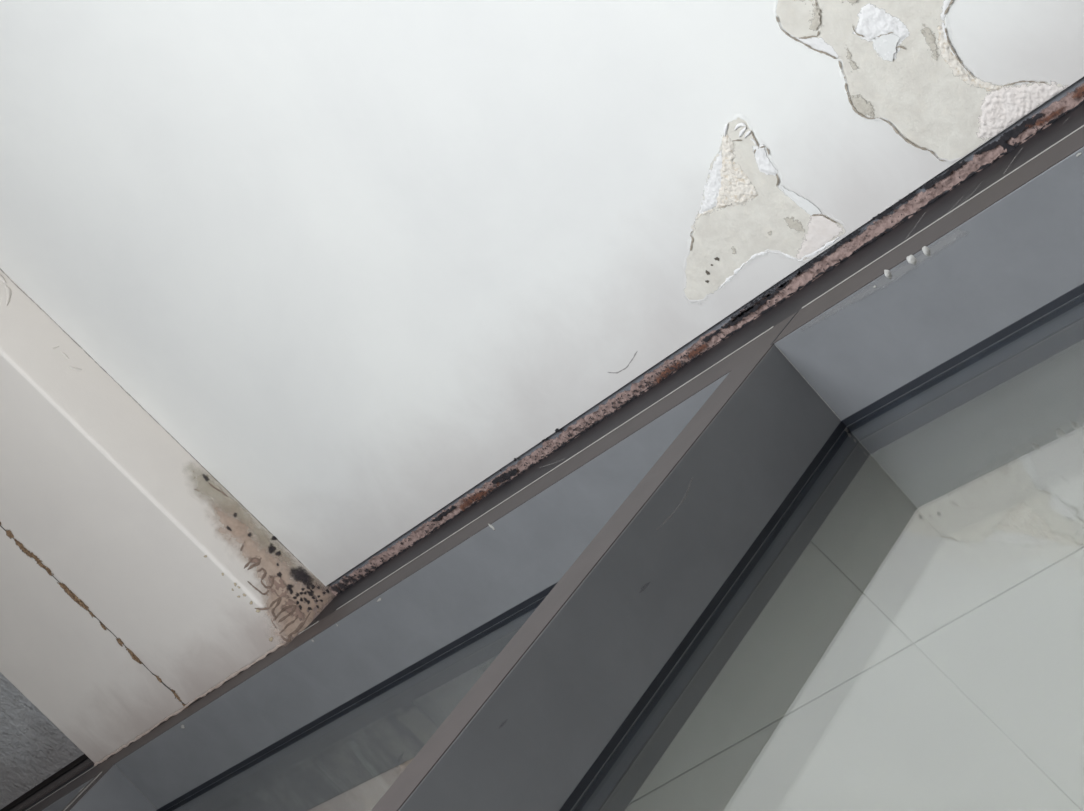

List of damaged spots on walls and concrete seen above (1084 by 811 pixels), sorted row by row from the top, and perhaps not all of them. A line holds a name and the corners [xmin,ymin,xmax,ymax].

peeling [771,0,1070,165]
peeling [679,112,850,307]
leakage [466,324,730,501]
leakage [195,474,415,642]
crack [94,615,188,705]